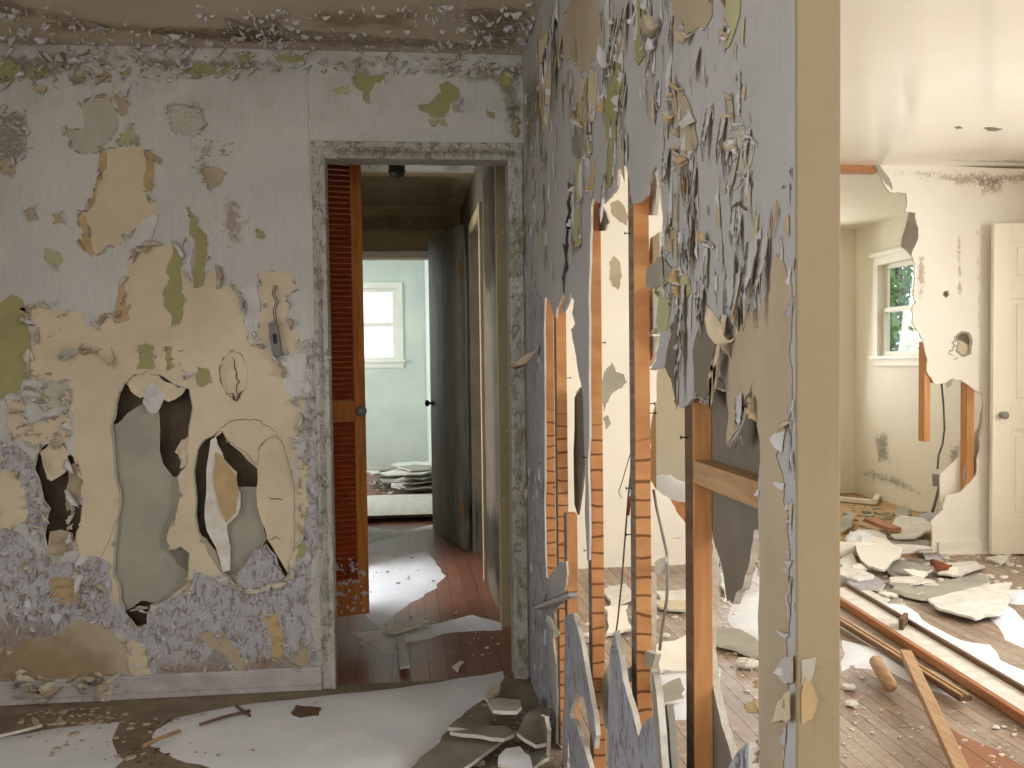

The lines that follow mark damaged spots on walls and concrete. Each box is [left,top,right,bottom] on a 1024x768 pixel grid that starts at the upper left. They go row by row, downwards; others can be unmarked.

peeling [0,0,794,768]
spalling [955,331,973,357]